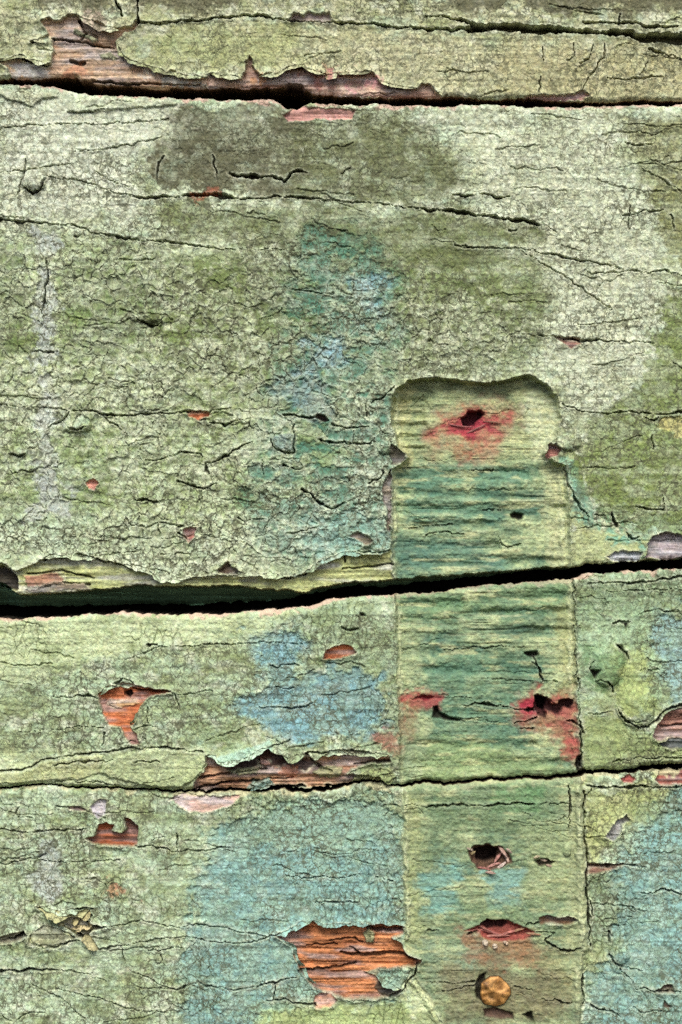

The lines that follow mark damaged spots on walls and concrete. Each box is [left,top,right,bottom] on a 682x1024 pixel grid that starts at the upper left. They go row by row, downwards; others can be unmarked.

peeling [0,13,441,122]
crack [0,107,682,316]
crack [498,333,654,344]
crack [1,386,397,534]
crack [562,403,682,450]
peeling [0,531,395,607]
crack [42,498,390,584]
crack [563,467,665,540]
peeling [607,531,682,562]
peeling [0,682,397,814]
peeling [68,798,139,847]
peeling [276,921,420,1009]